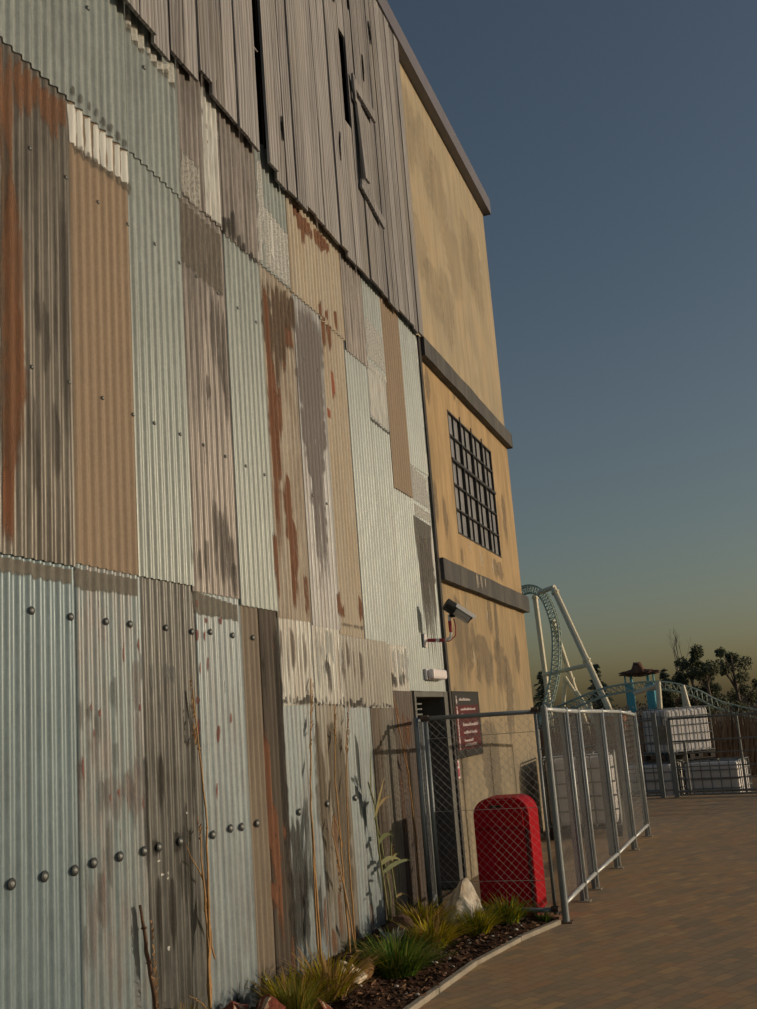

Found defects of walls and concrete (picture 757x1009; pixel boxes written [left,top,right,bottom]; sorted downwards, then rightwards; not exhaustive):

rust [0,47,66,538]
rust [292,205,329,254]
rust [318,301,338,350]
rust [261,279,309,610]
rust [263,736,302,970]